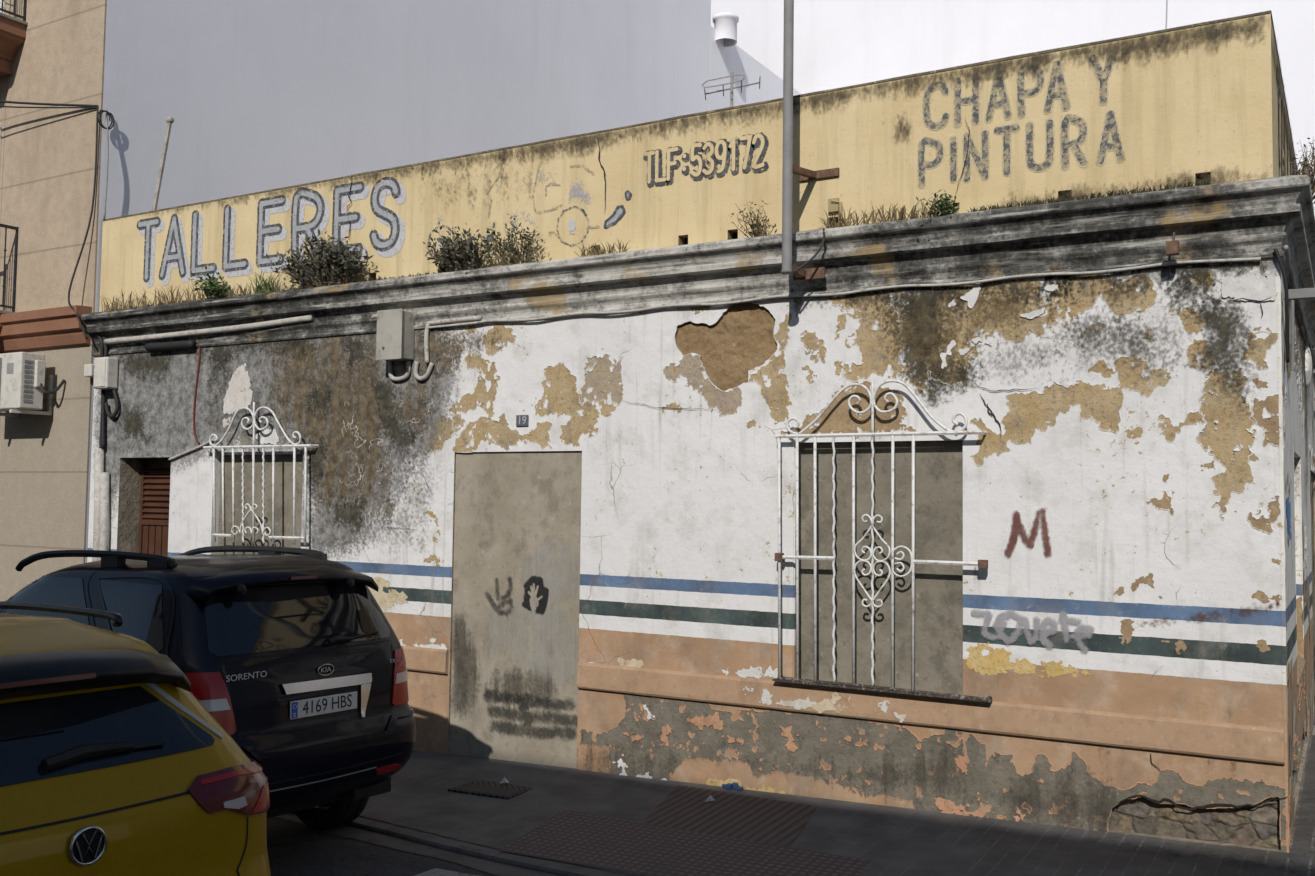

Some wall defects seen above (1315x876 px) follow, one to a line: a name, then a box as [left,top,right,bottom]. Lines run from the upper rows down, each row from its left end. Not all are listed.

leakage [268,14,1298,196]
leakage [94,328,502,554]
peeling [398,323,624,453]
peeling [661,271,1315,535]
leakage [1287,280,1310,492]
flaking render [579,526,1314,853]